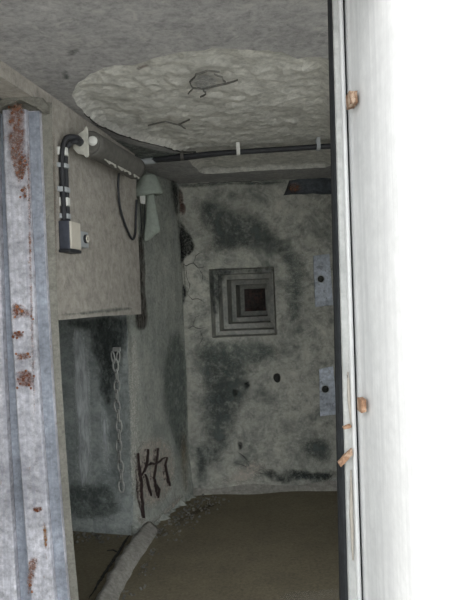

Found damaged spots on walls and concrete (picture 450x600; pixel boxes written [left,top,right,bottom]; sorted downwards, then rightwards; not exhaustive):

crack [188,69,238,98]
corrosion [8,105,30,201]
crack [84,113,196,153]
damp [202,204,302,317]
corrosion [16,370,35,390]
damp [70,332,116,518]
damp [197,343,273,474]
damp [267,470,333,482]
corrosion [28,559,37,593]